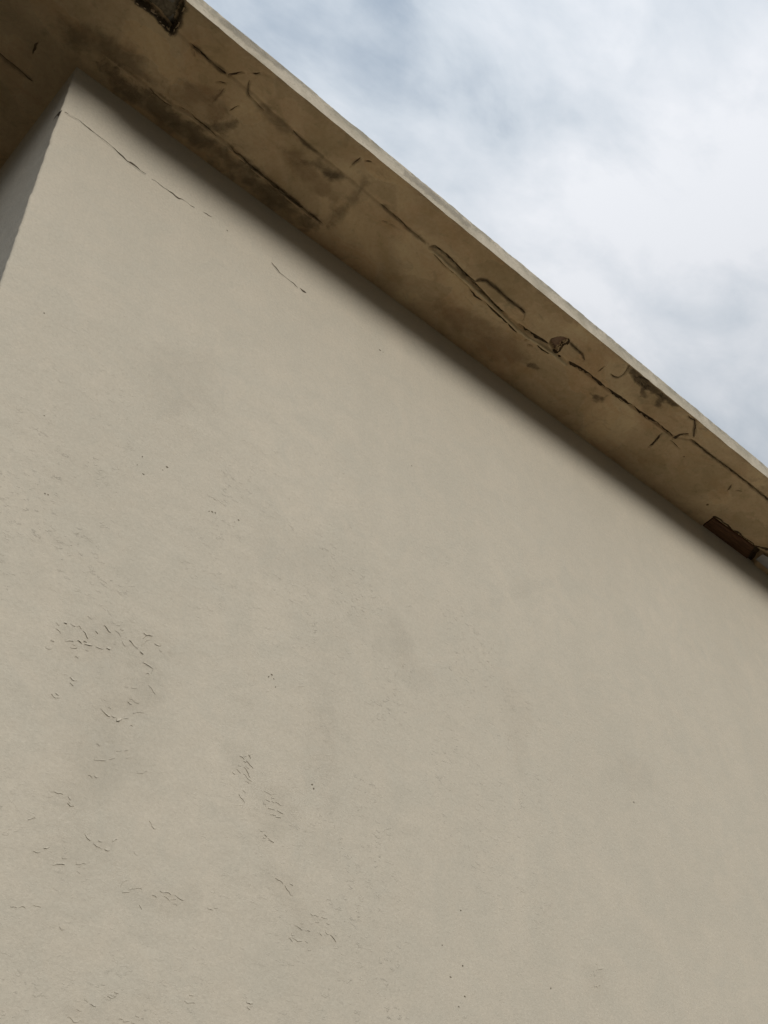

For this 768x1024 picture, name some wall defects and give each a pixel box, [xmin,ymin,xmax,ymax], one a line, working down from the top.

spalling [135,0,186,35]
crack [54,110,210,216]
crack [271,263,306,293]
peeling [549,336,585,364]
crack [381,204,768,500]
water stain [631,369,677,406]